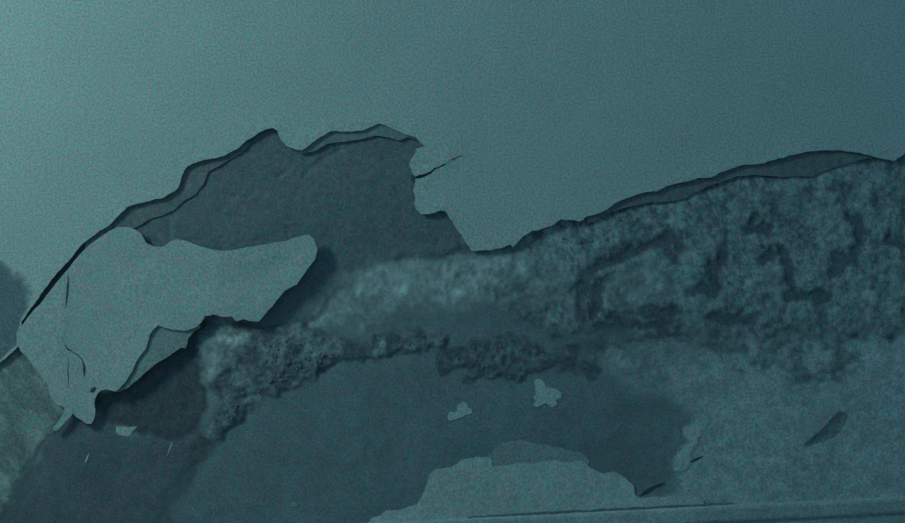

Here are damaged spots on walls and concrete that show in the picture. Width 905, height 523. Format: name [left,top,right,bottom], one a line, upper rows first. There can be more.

crack [411,155,463,181]
spalling [0,124,905,514]